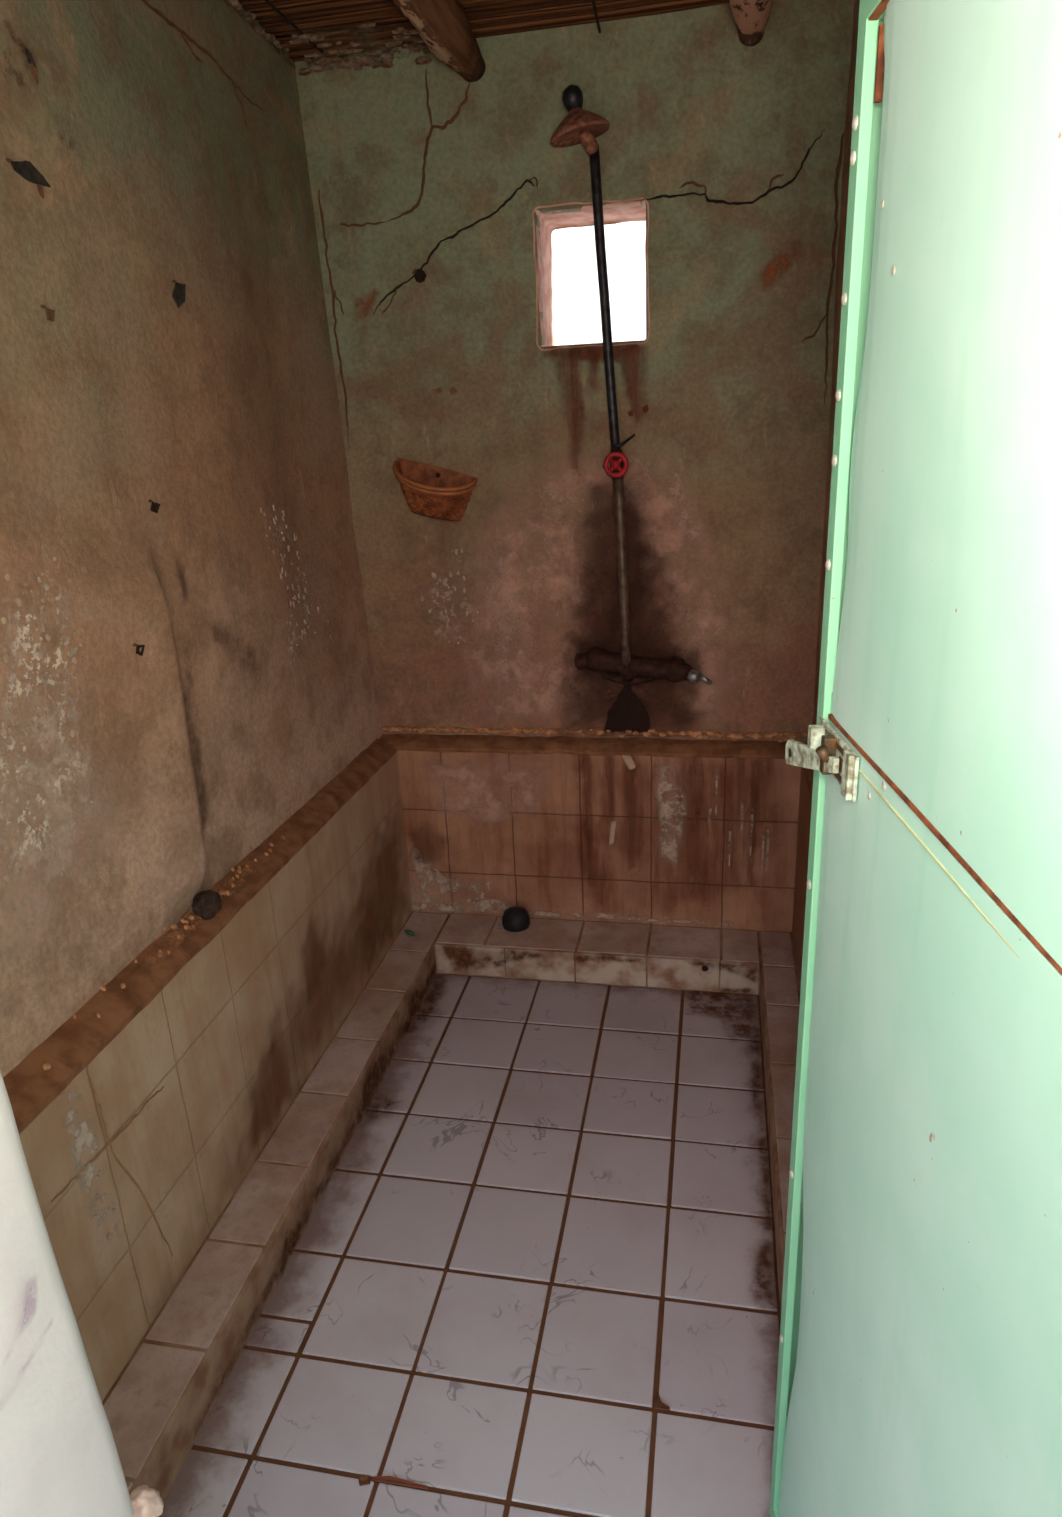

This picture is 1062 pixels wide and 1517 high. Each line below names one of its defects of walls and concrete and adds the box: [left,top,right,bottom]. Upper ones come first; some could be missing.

flaking render [6,158,51,199]
crack [318,69,538,448]
crack [643,130,844,402]
damp [465,461,727,733]
damp [621,755,636,770]
damp [609,821,617,845]
damp [656,767,686,862]
damp [365,844,511,947]
crack [51,1078,173,1256]